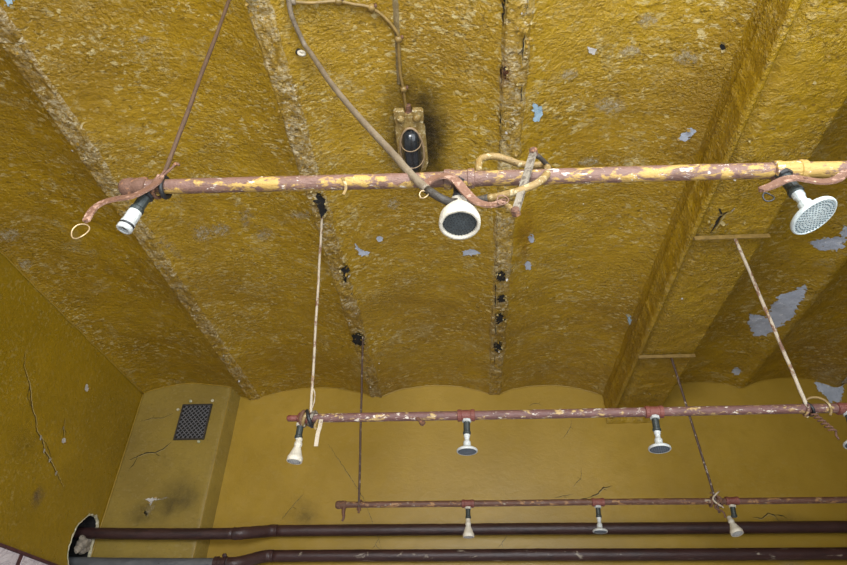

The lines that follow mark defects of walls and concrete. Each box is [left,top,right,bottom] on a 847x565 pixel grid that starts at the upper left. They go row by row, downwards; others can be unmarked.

peeling [497,3,535,92]
peeling [496,98,547,157]
peeling [676,128,696,141]
peeling [810,225,847,252]
peeling [747,284,807,338]
peeling [814,377,847,403]
crack [24,355,64,486]